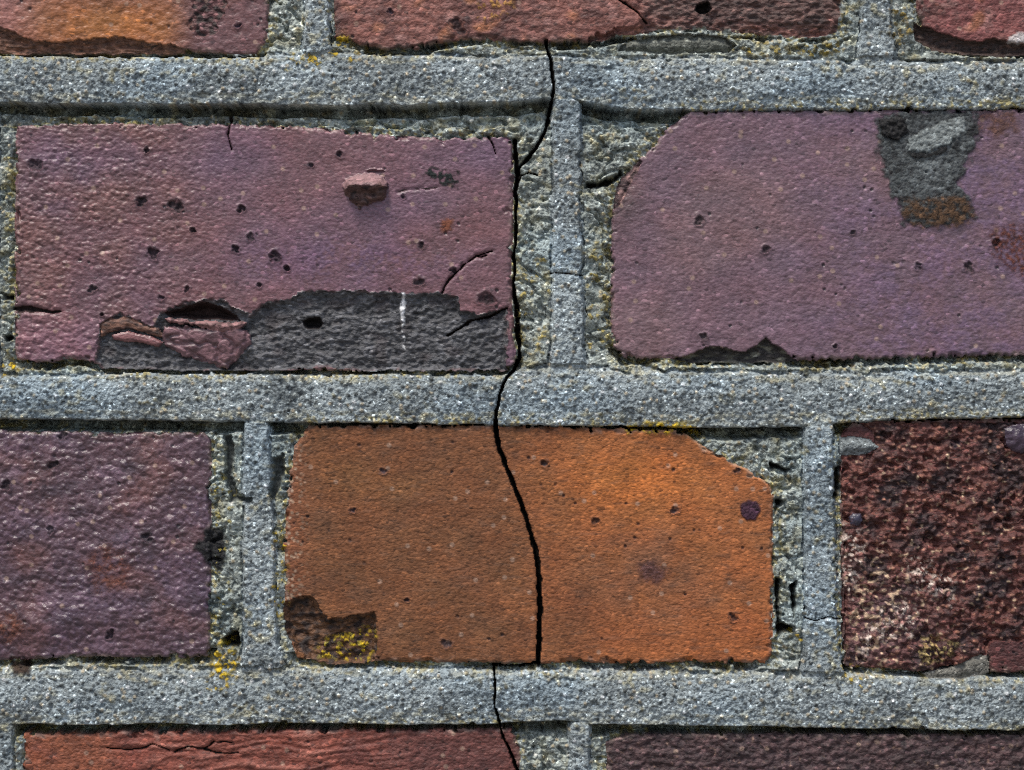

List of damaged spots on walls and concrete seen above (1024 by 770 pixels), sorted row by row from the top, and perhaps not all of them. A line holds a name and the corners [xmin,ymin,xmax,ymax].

spalling [95,279,509,373]
spalling [675,333,798,364]
crack [441,40,556,770]
spalling [283,596,378,666]